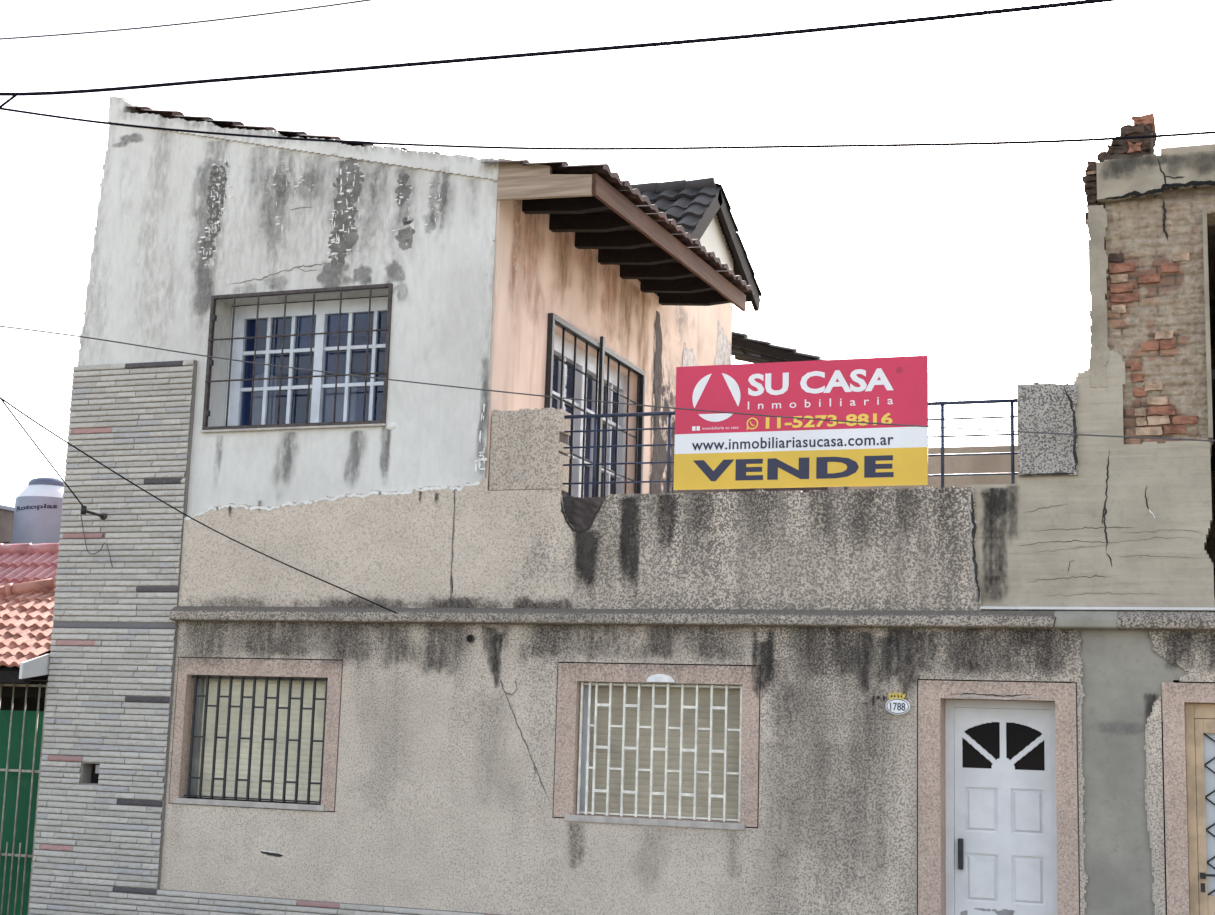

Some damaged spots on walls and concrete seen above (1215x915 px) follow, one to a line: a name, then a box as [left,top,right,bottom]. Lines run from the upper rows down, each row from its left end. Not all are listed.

peeling [195,155,232,311]
peeling [327,158,365,266]
flaking render [1109,252,1190,314]
crack [1100,158,1215,240]
flaking render [1131,330,1198,436]
leakage [575,531,598,584]
leakage [620,498,640,579]
leakage [983,486,1016,599]
crack [1028,449,1196,596]
leakage [486,628,517,695]
leakage [752,632,773,691]
crack [502,687,549,800]